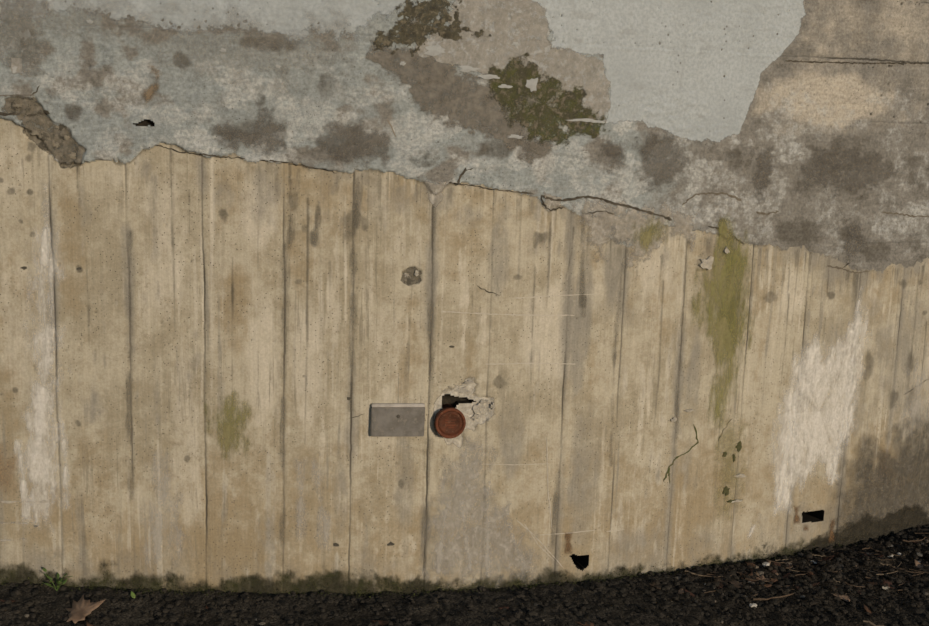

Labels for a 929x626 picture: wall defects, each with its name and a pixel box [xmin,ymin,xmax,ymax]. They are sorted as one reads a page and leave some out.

peeling [366,0,611,164]
spalling [2,97,86,168]
spalling [133,119,155,127]
crack [449,168,779,221]
spalling [401,267,422,286]
leakage [16,228,68,522]
spalling [433,377,495,448]
crack [663,409,733,482]
leakage [775,300,867,513]
leakage [793,379,929,556]
spalling [569,554,589,571]